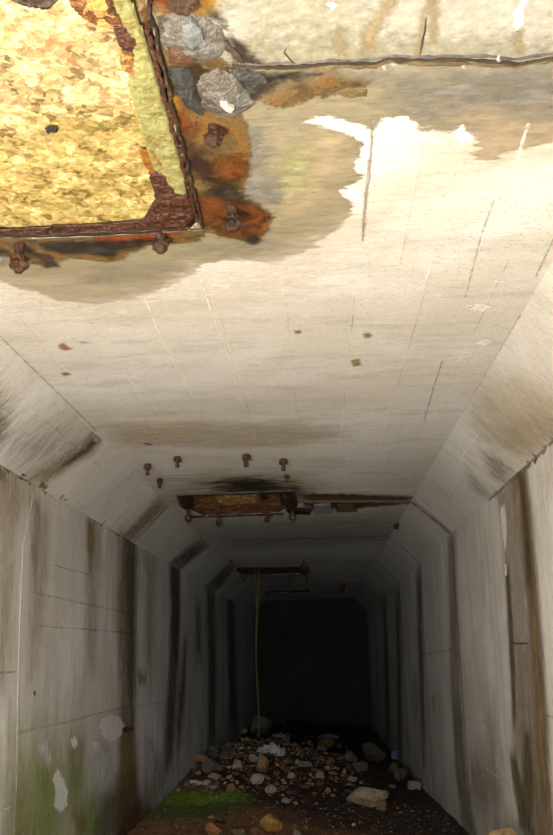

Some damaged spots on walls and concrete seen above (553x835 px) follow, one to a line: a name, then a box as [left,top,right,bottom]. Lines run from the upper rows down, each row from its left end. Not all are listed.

corrosion [151,0,301,245]
water stain [0,0,553,304]
crack [361,129,373,239]
water stain [88,522,98,641]
water stain [97,499,165,835]
water stain [163,543,206,794]
water stain [196,477,499,834]
water stain [487,457,553,835]